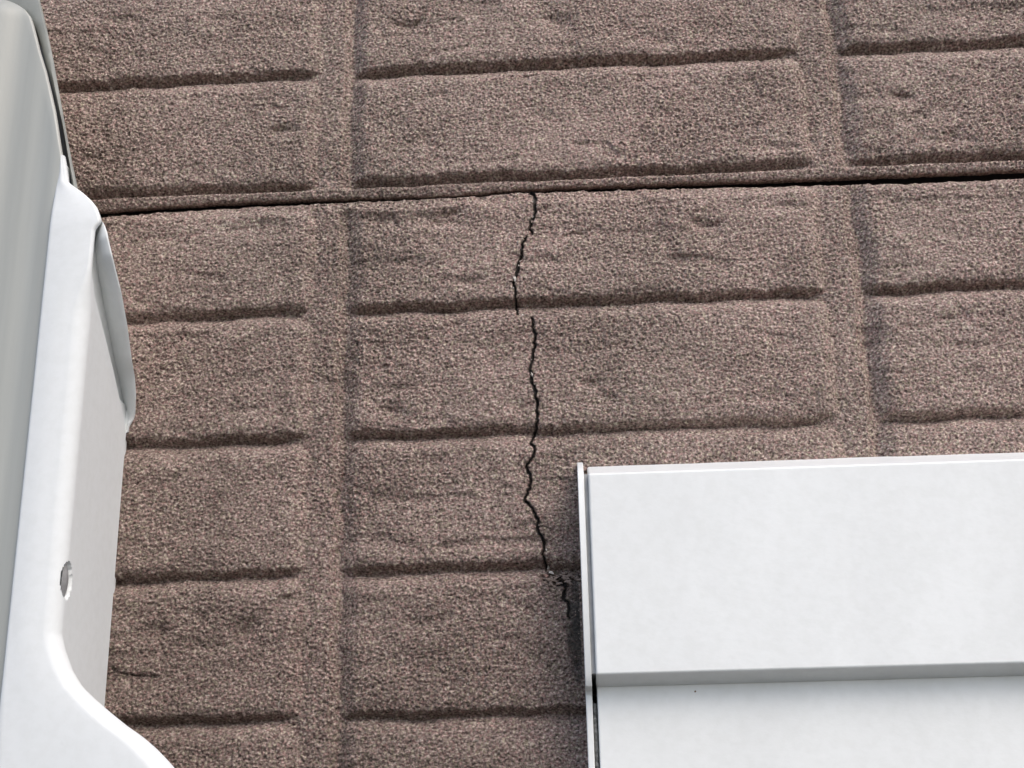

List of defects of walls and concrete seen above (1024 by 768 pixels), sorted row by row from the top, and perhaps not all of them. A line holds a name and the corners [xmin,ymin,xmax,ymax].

crack [510,191,578,618]